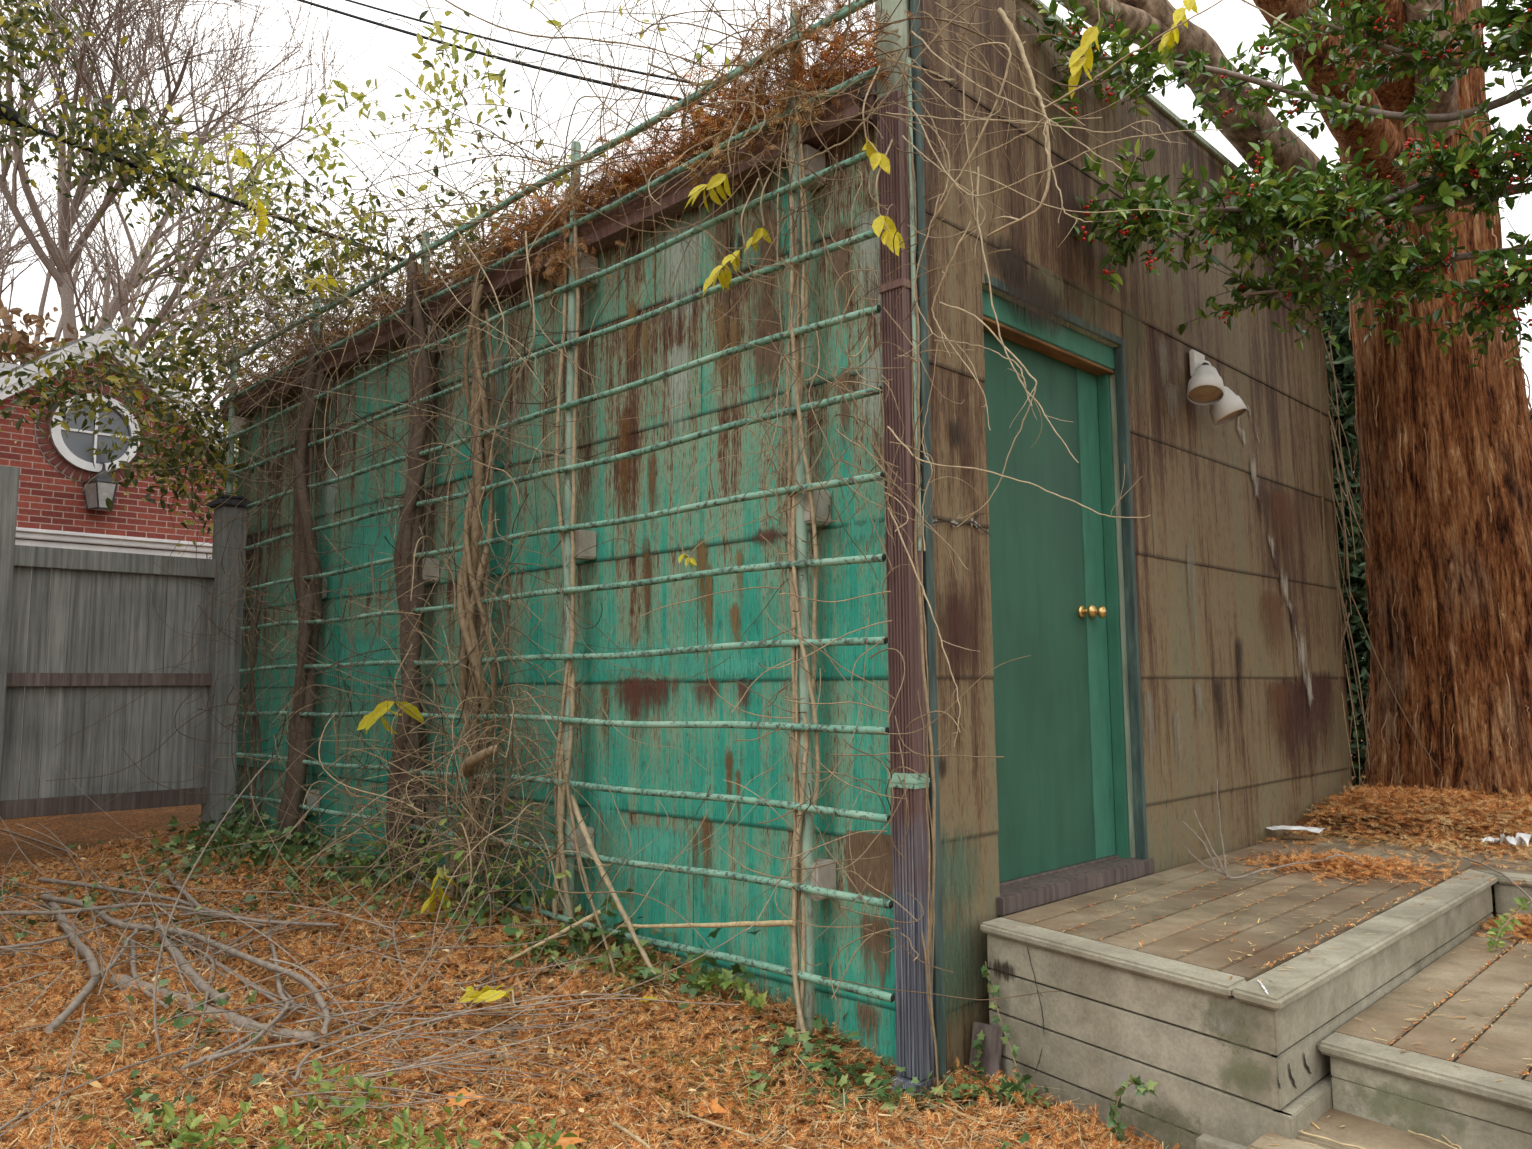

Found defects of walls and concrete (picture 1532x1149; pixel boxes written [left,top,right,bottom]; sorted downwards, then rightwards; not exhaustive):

rust [620,410,655,512]
rust [642,540,652,622]
rust [725,751,740,818]
rust [693,817,712,889]